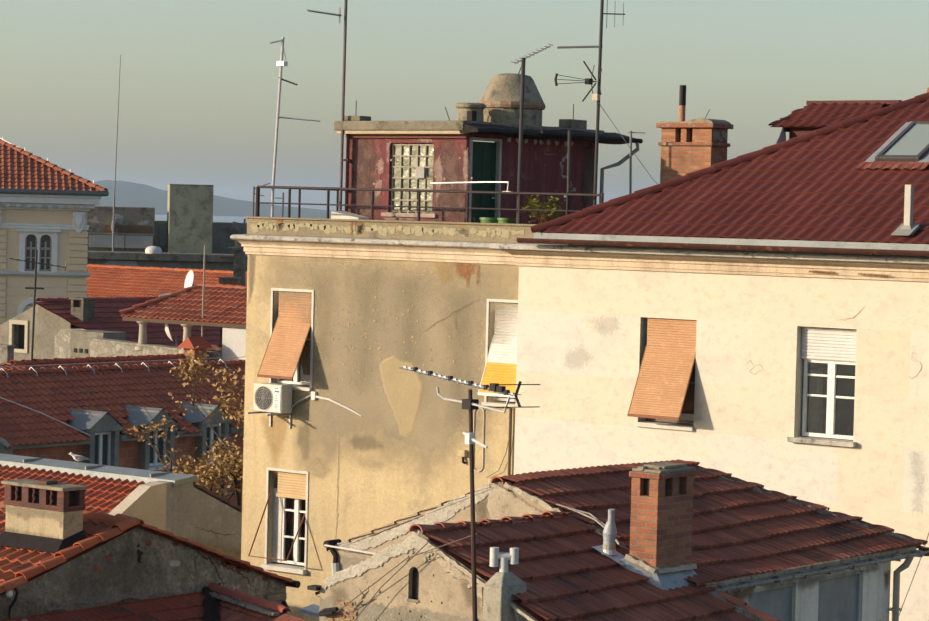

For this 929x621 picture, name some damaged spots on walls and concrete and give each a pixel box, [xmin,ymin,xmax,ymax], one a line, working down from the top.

peeling [373,138,392,198]
peeling [250,210,525,239]
rust [455,263,479,283]
water stain [278,259,518,461]
spalling [326,600,358,621]